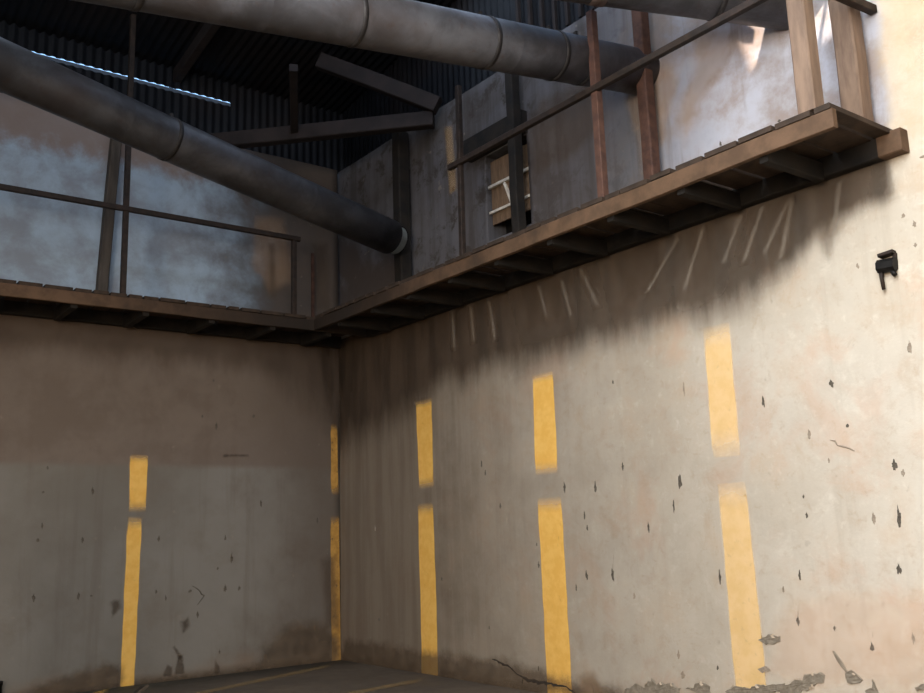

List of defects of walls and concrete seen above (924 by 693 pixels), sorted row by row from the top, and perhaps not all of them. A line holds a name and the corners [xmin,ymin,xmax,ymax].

spalling [759,634,781,645]
crack [832,651,847,672]
crack [492,659,574,693]
spalling [624,671,711,693]
spalling [725,672,825,693]